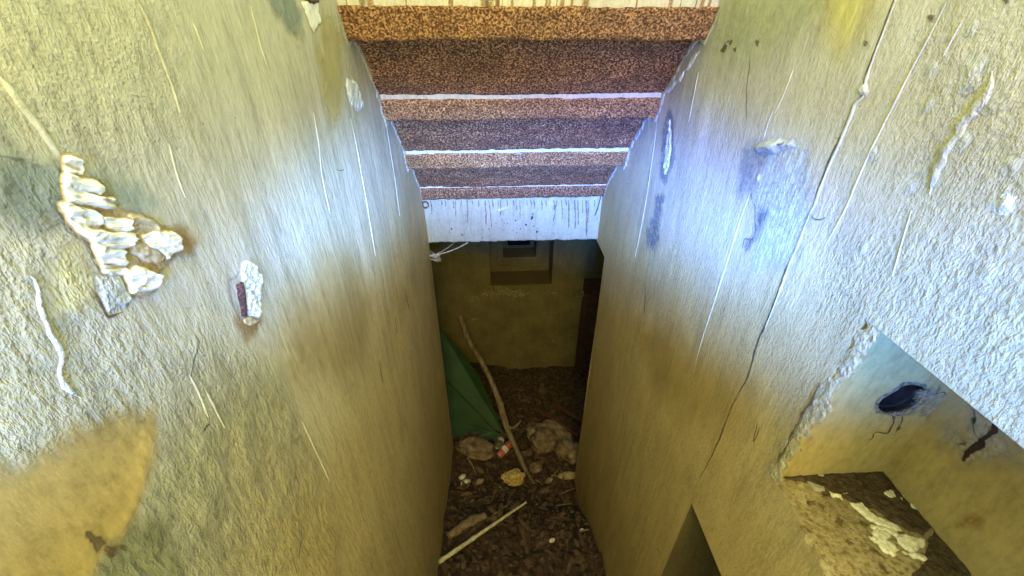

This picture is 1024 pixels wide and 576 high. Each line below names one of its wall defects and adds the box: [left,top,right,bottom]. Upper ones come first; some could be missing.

peeling [56,152,183,314]
spalling [228,260,263,337]
crack [695,0,896,488]
water stain [0,417,177,576]
spalling [766,316,934,561]